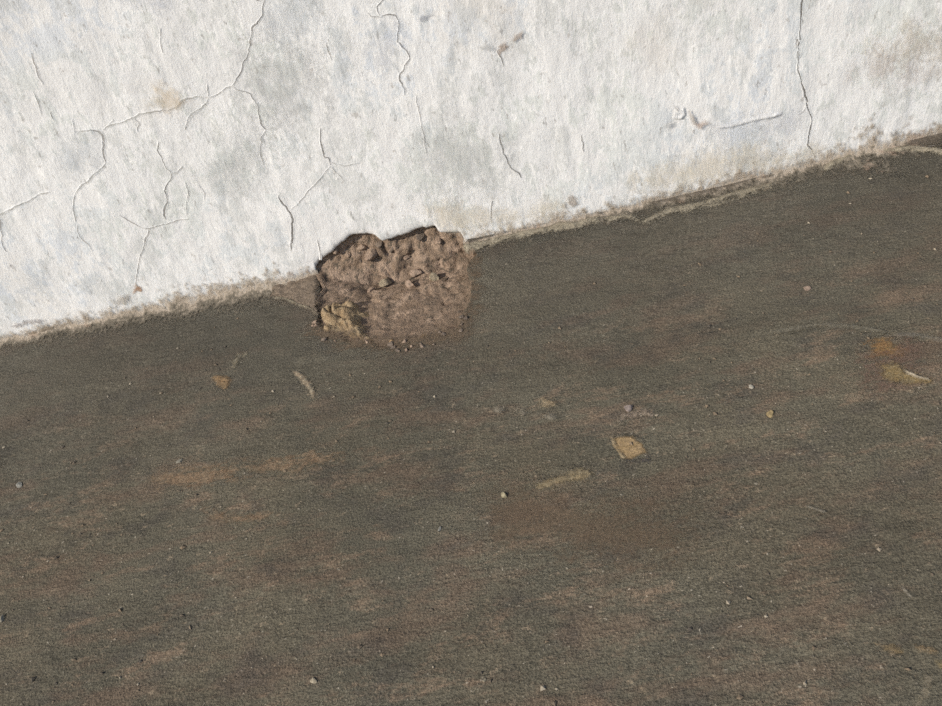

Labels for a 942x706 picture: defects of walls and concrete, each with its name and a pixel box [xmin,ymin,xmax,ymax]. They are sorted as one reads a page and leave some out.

crack [0,191,49,252]
crack [30,0,267,286]
crack [277,128,360,260]
crack [367,0,428,153]
crack [793,0,817,161]